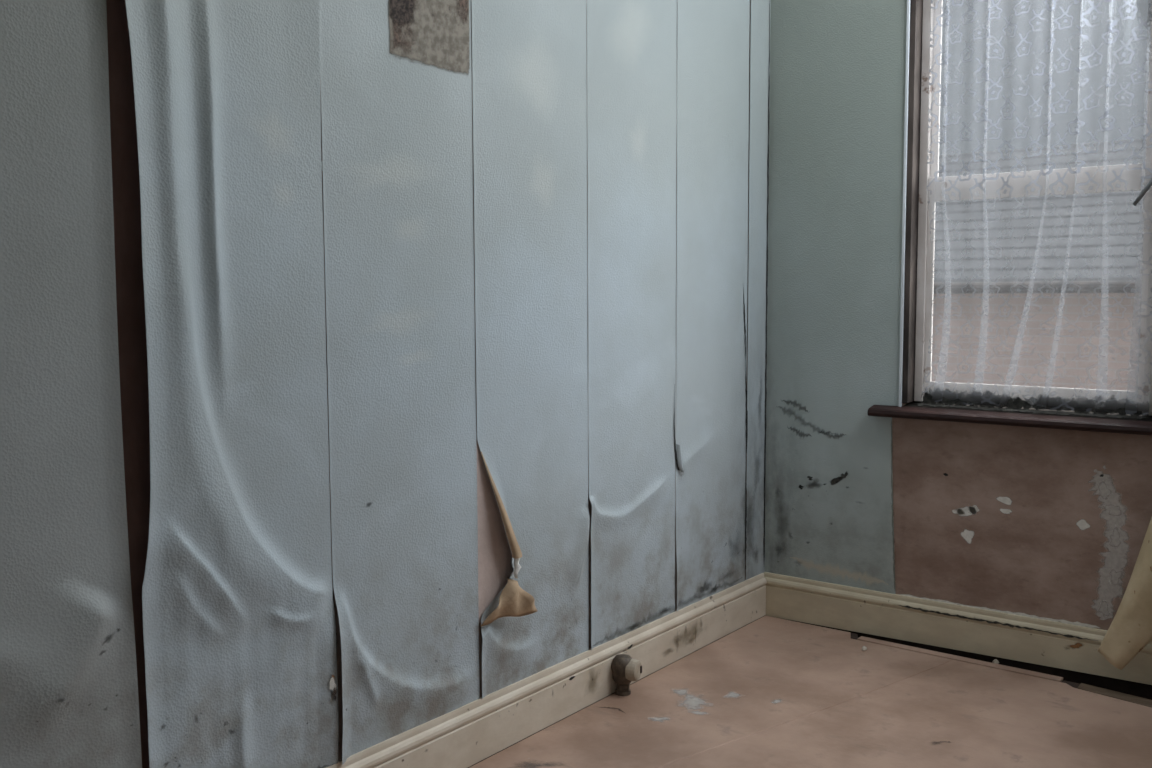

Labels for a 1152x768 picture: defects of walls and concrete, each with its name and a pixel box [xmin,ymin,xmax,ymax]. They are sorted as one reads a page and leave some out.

peeling [389,0,470,74]
leakage [799,471,848,489]
peeling [892,418,1152,630]